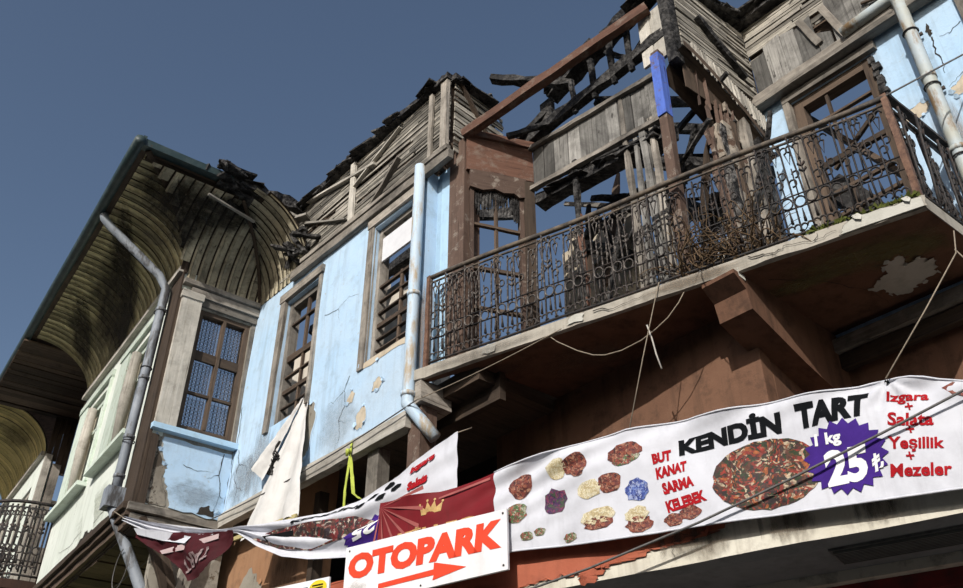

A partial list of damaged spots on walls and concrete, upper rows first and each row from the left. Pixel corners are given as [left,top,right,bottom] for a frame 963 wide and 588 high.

crack [931,21,961,84]
peeling [906,98,931,123]
peeling [948,75,963,99]
water stain [116,211,137,351]
peeling [866,254,941,297]
water stain [71,300,90,370]
spalling [358,337,405,369]
peeling [344,376,385,431]
spalling [145,432,167,507]
crack [183,410,245,512]
spalling [196,506,219,518]
peeling [434,522,732,588]